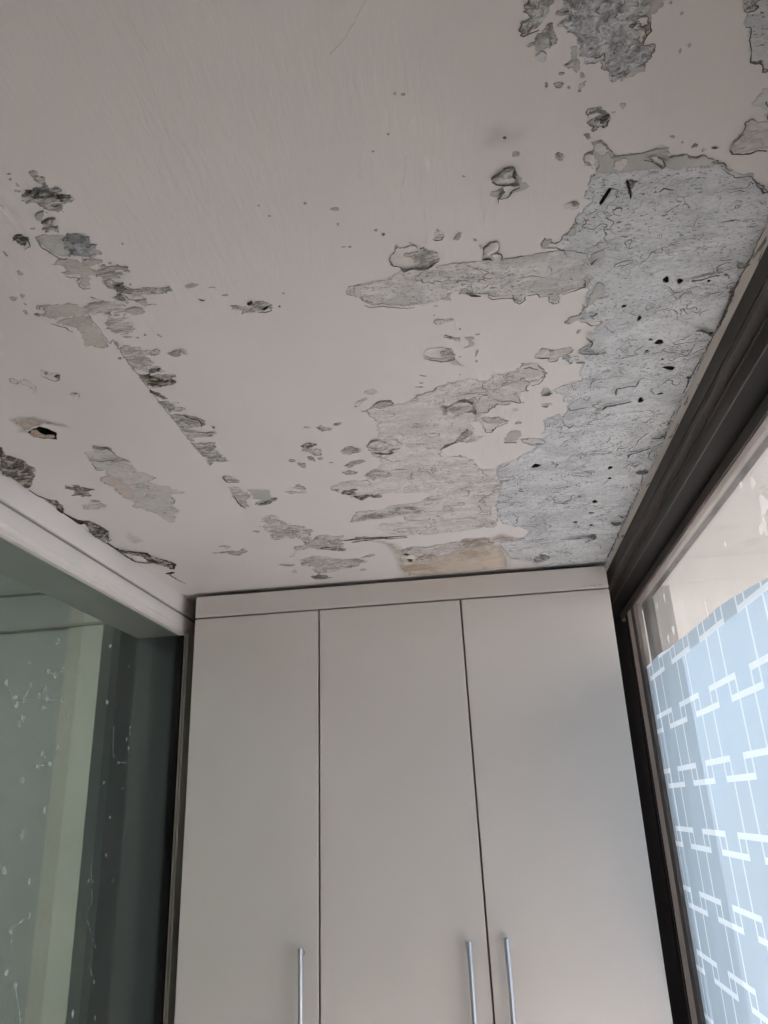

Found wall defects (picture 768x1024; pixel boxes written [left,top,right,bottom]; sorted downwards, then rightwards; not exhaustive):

spalling [517,0,684,92]
peeling [742,0,768,73]
spalling [7,170,228,466]
peeling [222,88,768,580]
spalling [0,447,36,488]
peeling [46,445,185,569]
water stain [399,545,505,575]